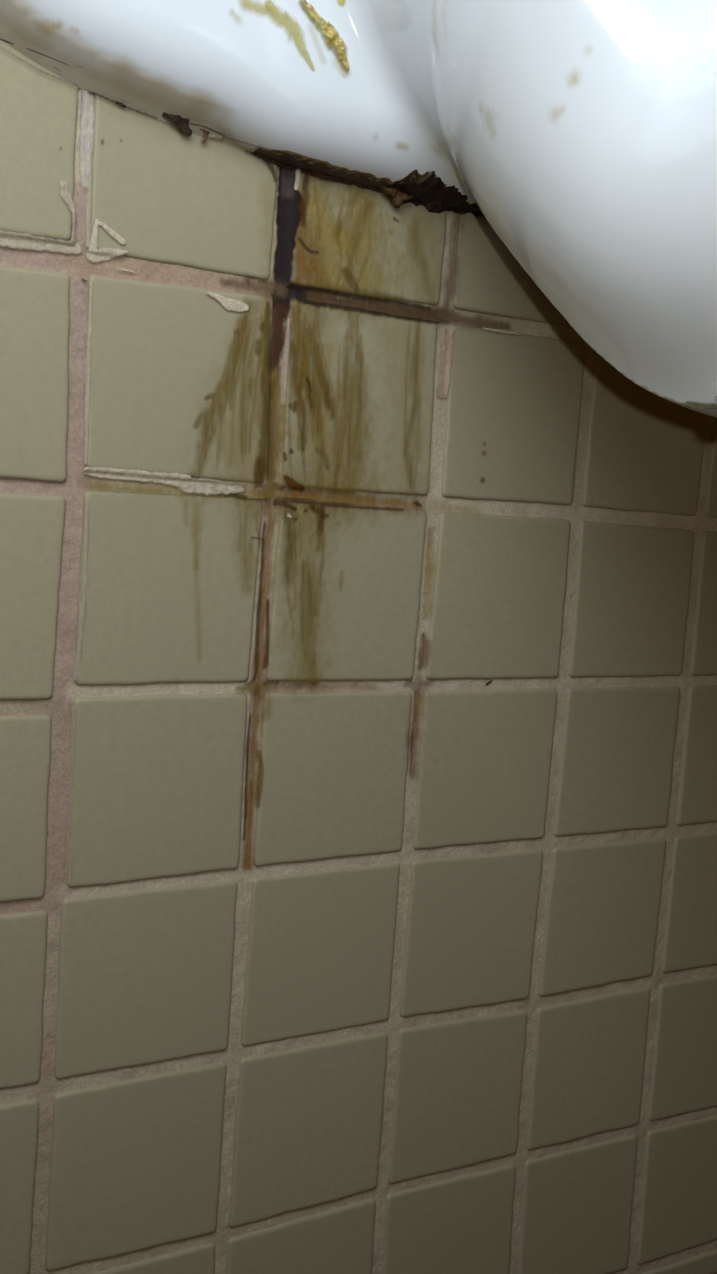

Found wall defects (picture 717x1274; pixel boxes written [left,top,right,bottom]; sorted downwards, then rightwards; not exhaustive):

peeling [0,175,135,273]
peeling [82,281,244,494]
rust [293,178,382,298]
leakage [222,167,509,499]
rust [95,302,421,868]